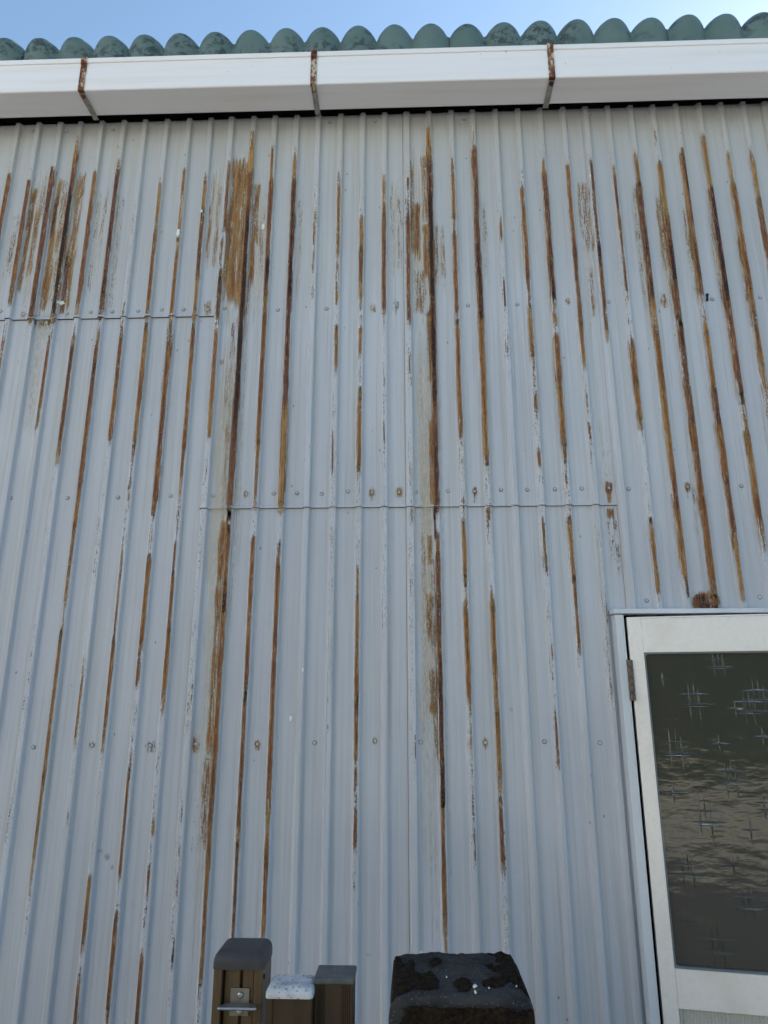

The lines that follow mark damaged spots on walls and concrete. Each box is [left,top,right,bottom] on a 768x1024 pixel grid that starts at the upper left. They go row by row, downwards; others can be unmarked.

rust [0,130,137,879]
rust [100,173,163,765]
rust [160,121,281,995]
rust [278,156,319,511]
rust [352,537,361,888]
rust [356,122,506,953]
rust [520,172,543,483]
rust [542,158,609,665]
rust [628,319,644,442]
rust [632,147,720,608]
rust [679,148,745,601]
rust [702,135,768,557]